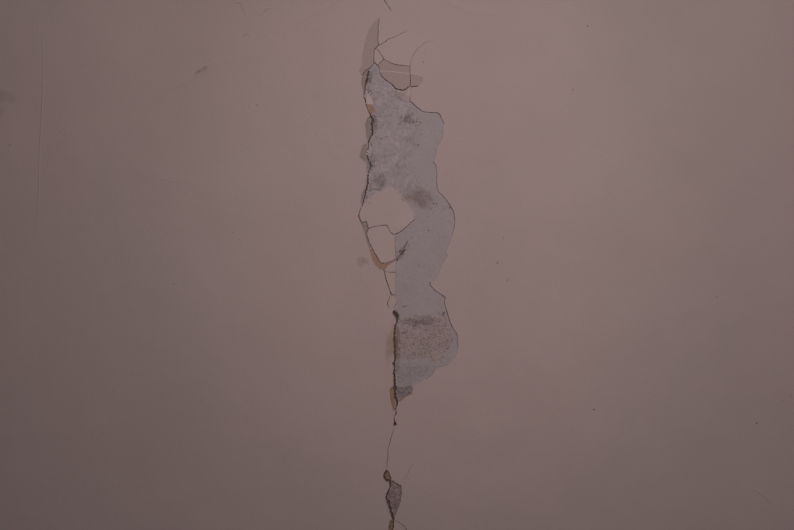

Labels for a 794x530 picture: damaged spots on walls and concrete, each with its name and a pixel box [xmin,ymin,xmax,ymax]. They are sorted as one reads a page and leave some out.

crack [361,0,430,206]
peeling [358,3,458,411]
crack [383,269,400,460]
spalling [383,470,402,530]